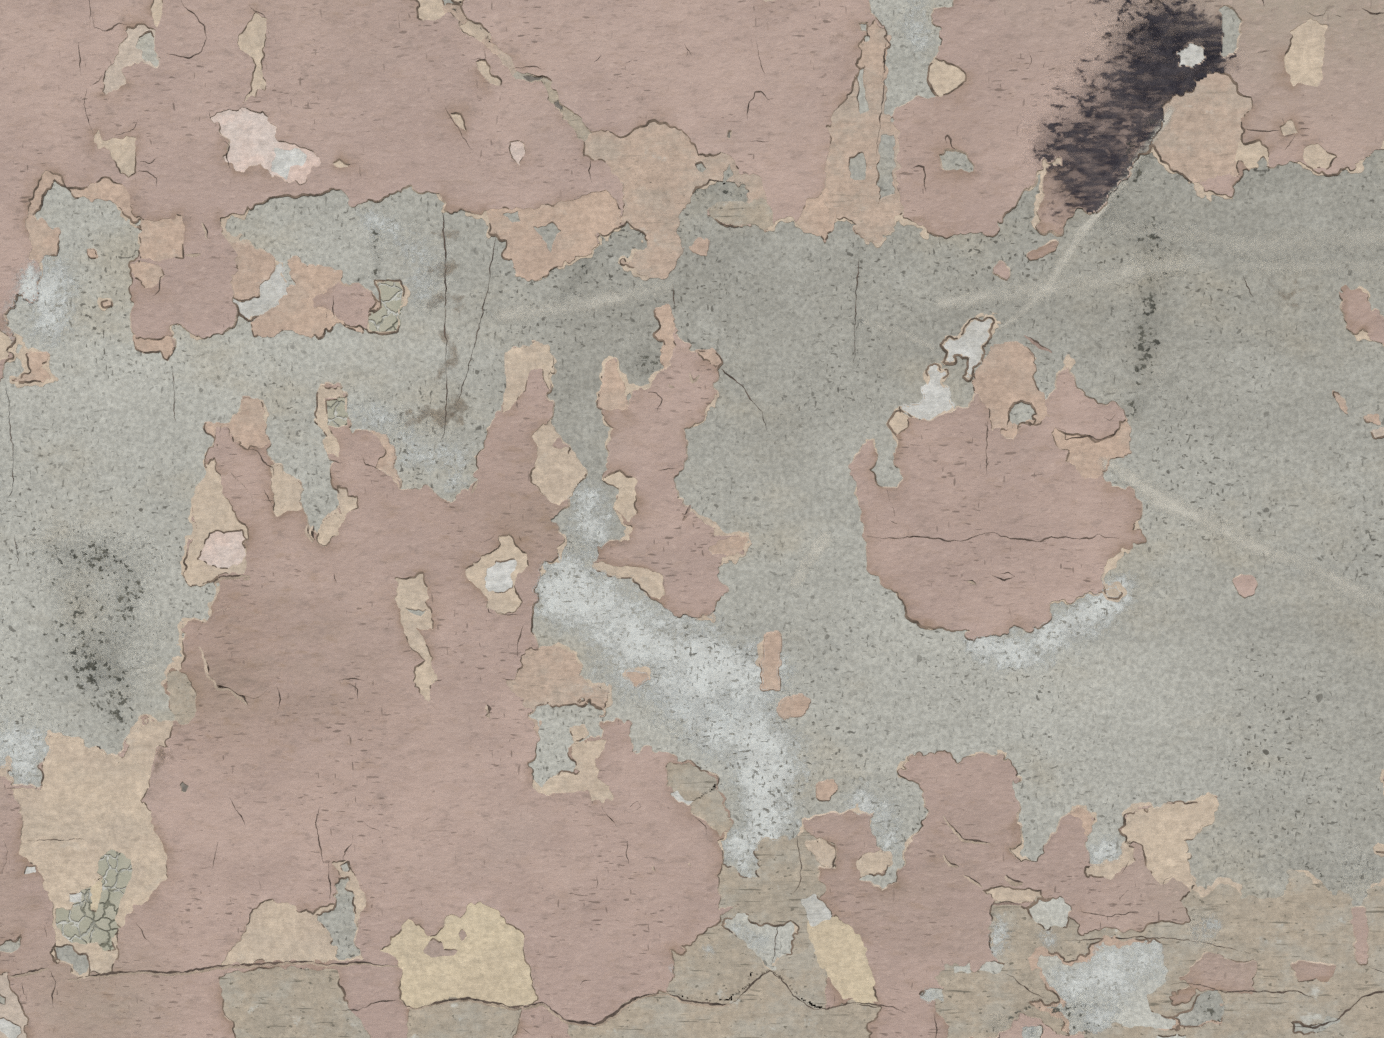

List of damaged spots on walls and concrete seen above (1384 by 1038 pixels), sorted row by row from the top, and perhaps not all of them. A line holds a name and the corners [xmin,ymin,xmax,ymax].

damp [1037,0,1236,217]
peeling [1177,43,1205,68]
crack [870,495,1116,542]
damp [39,531,154,731]
damp [534,485,810,878]
peeling [12,720,173,977]
peeling [506,583,879,1009]
crack [795,841,833,917]
crack [9,926,399,1003]
peeling [381,902,539,1038]
crack [344,927,938,1038]
peeling [568,971,882,1038]